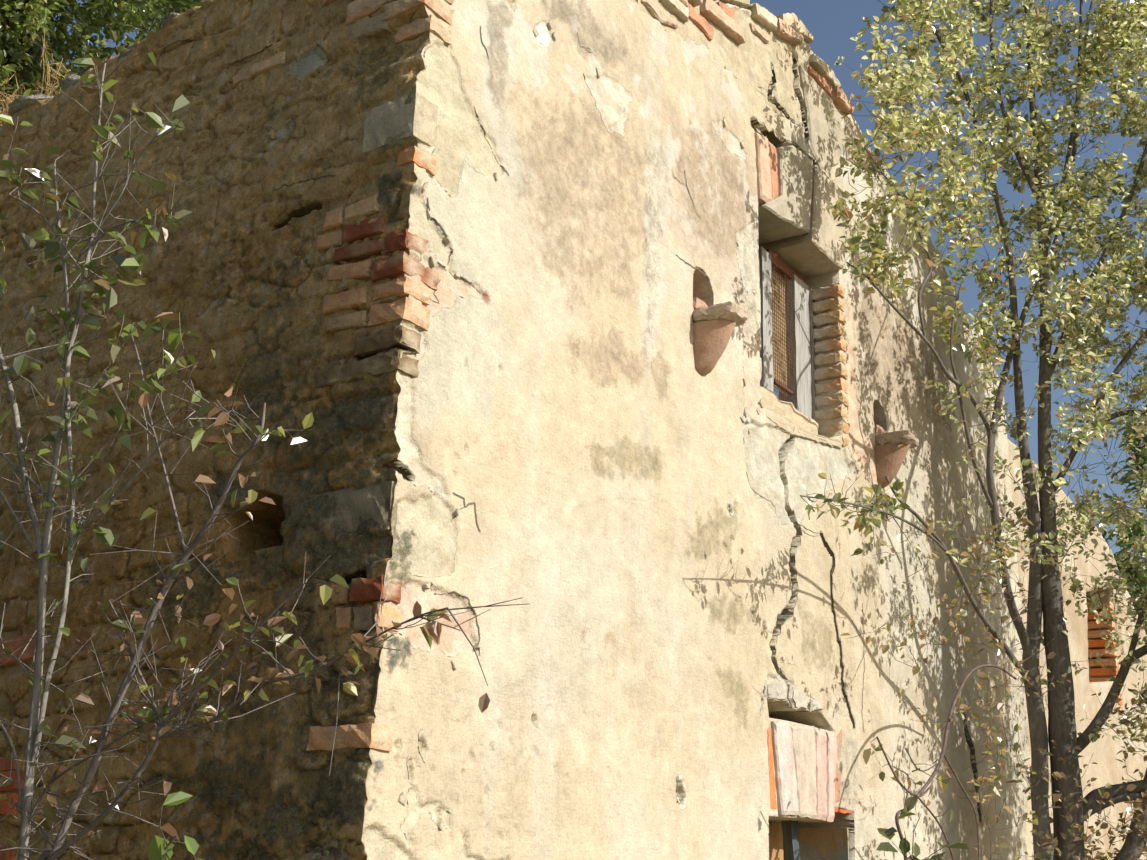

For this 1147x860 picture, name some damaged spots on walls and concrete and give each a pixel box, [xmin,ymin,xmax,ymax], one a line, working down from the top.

spalling [405,42,504,316]
crack [750,54,829,179]
spalling [400,323,428,360]
spalling [382,370,482,671]
crack [746,427,865,733]